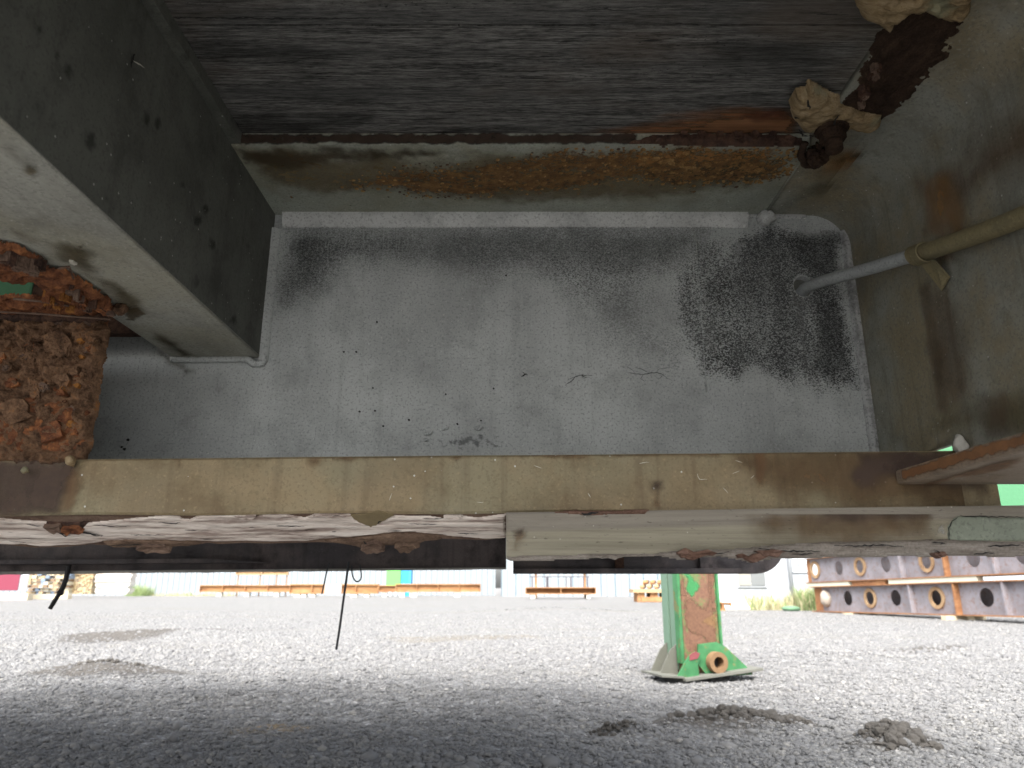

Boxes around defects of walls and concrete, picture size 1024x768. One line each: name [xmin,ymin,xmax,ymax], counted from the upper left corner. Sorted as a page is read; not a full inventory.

rust [244,141,817,200]
peeling [0,251,116,322]
damp [286,222,860,397]
peeling [0,510,506,554]